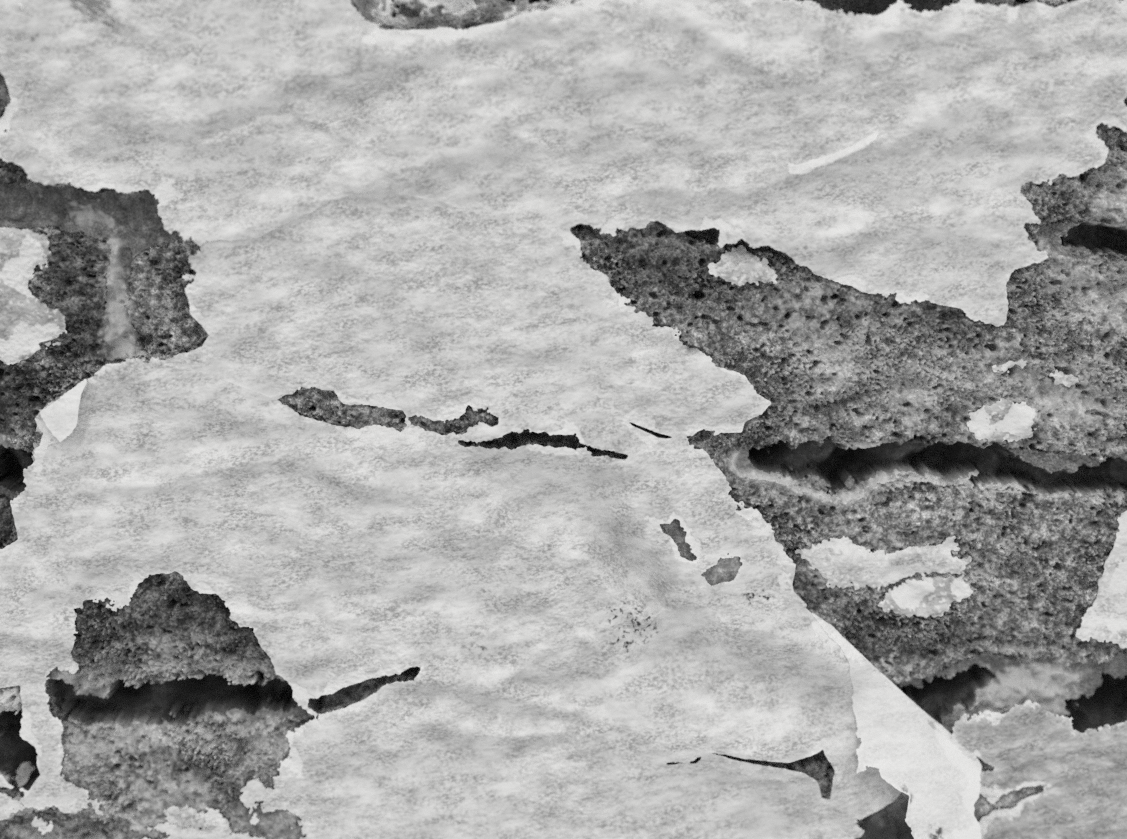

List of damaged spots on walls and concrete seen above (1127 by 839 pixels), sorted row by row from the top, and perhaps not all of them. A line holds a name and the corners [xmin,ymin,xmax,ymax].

spalling [0,73,11,132]
spalling [0,158,105,193]
spalling [0,225,209,450]
spalling [570,123,1127,685]
spalling [0,495,18,549]
spalling [0,571,323,839]
spalling [855,817,867,839]
spalling [974,785,1044,822]